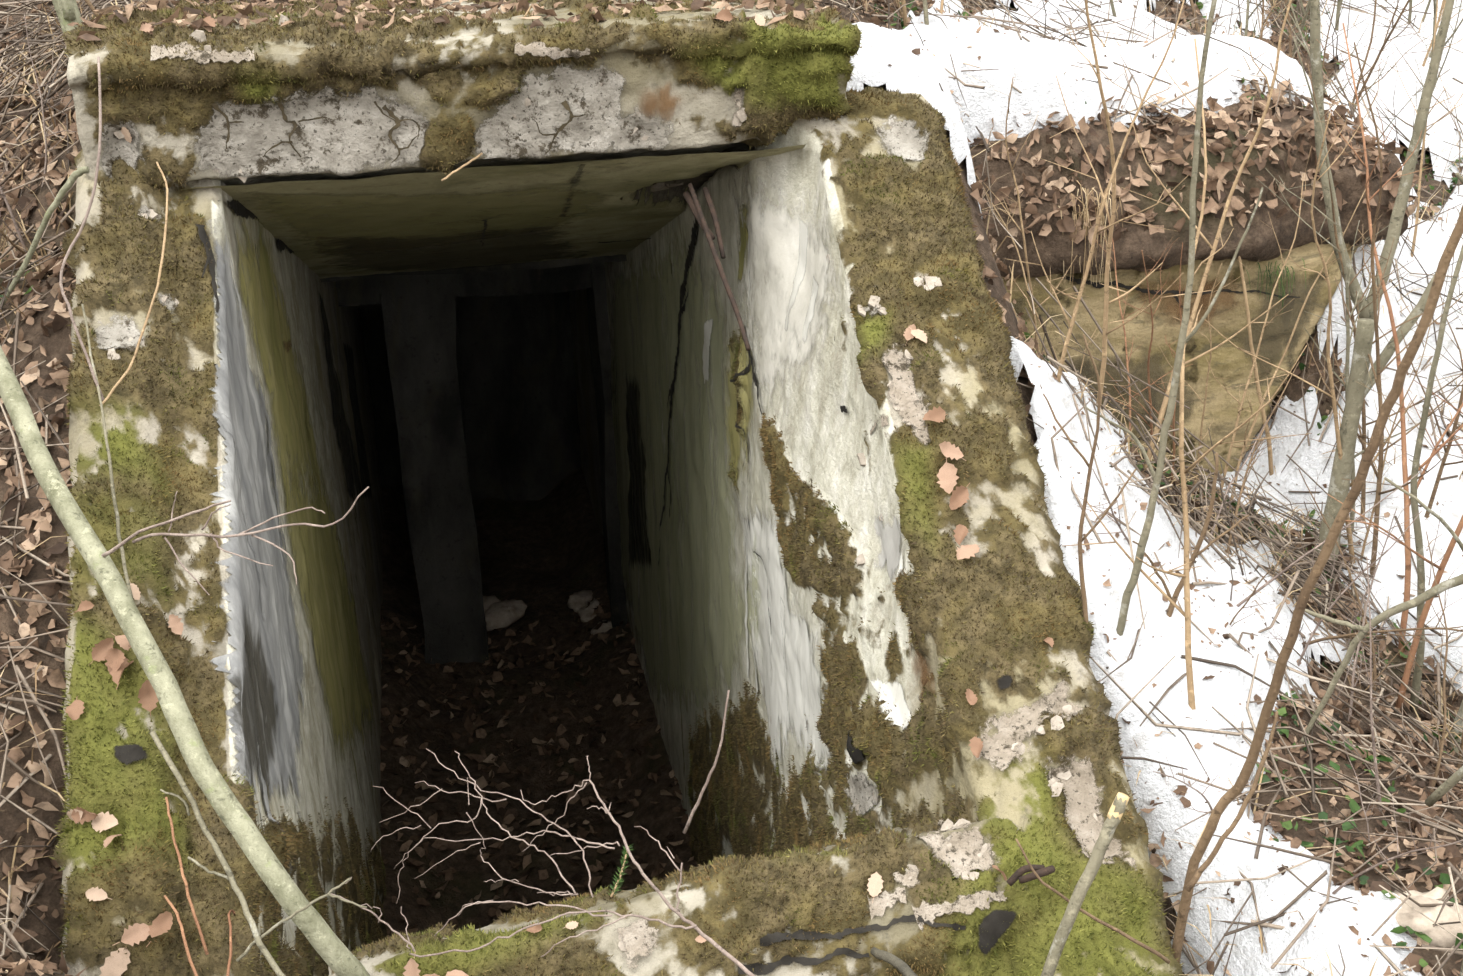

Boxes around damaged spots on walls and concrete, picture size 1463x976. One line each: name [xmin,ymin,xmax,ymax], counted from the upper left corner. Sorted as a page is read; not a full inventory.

crack [212,103,244,149]
crack [263,102,332,158]
crack [374,101,420,163]
crack [534,100,585,154]
crack [658,219,698,566]